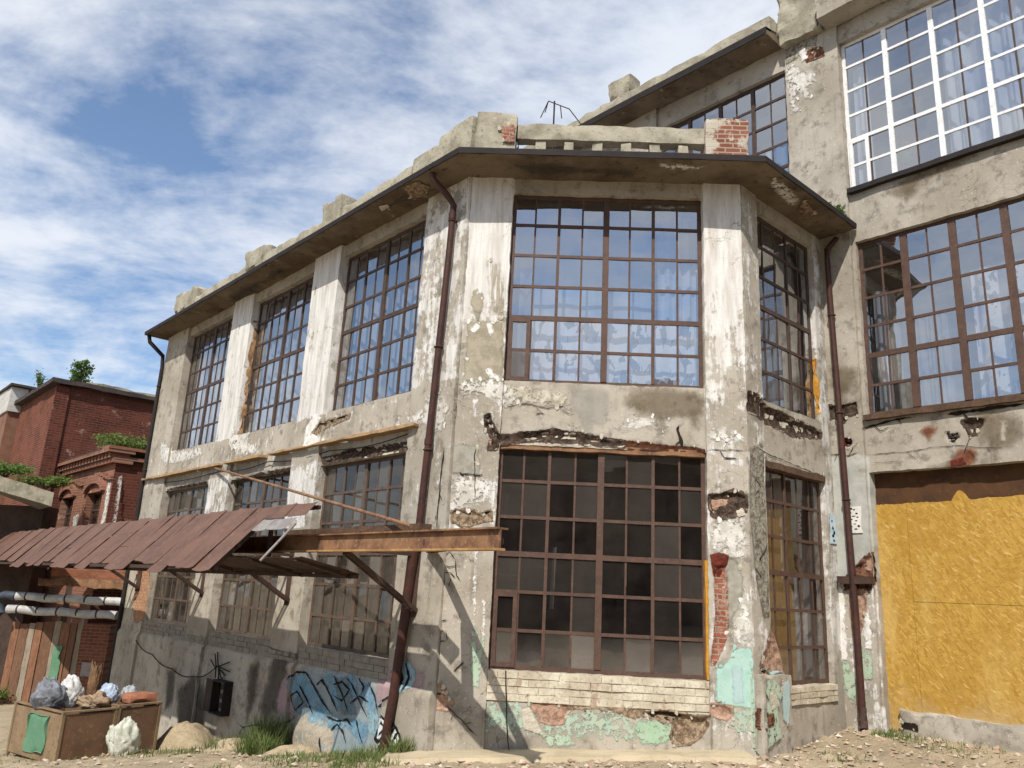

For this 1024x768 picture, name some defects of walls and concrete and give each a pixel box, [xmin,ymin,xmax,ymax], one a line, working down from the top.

peeling [785,35,825,112]
spalling [303,411,408,466]
leakage [631,391,701,415]
spalling [746,390,823,439]
spalling [948,417,985,456]
peeling [450,257,790,754]
spalling [838,552,876,703]